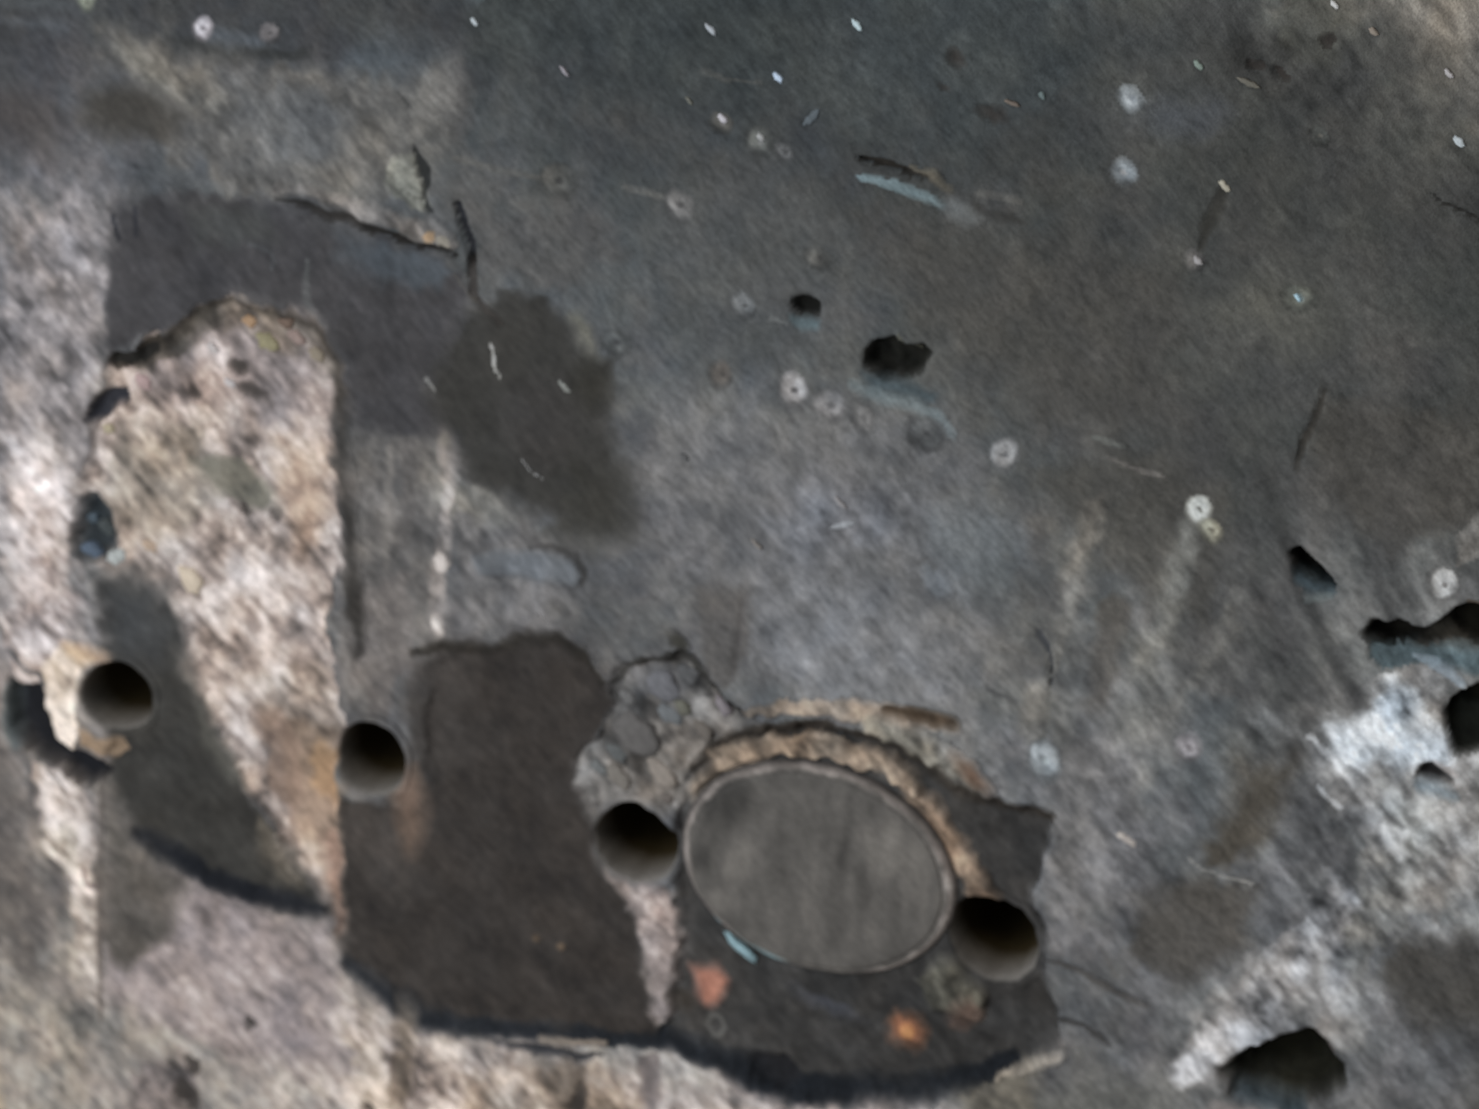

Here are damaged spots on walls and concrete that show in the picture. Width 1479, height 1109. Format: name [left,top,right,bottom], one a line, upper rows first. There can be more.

crack [274,90,504,327]
leakage [425,286,650,630]
spalling [0,187,1067,1109]
spalling [1358,599,1479,806]
leakage [1163,662,1479,1099]
spalling [1217,1026,1349,1109]